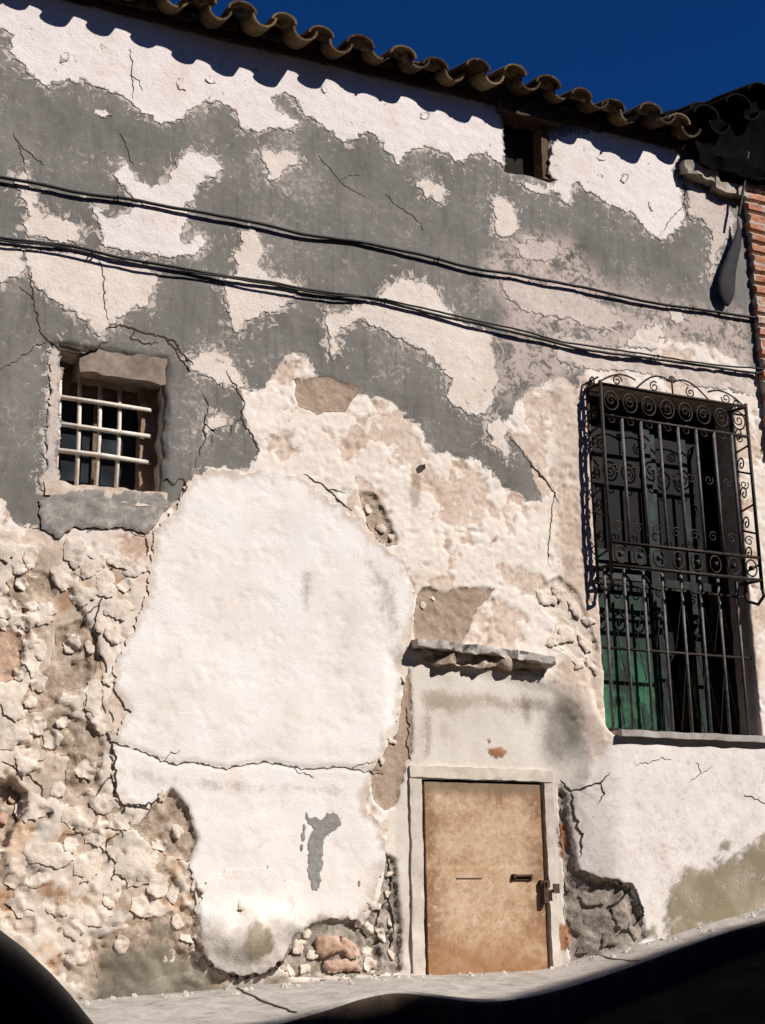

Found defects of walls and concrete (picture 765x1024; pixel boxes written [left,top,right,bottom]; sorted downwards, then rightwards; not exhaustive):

peeling [0,0,506,168]
crack [0,261,194,371]
peeling [0,151,225,337]
crack [165,370,260,497]
peeling [322,278,513,460]
crack [510,438,559,564]
peeling [520,131,734,277]
spalling [0,545,204,986]
crack [32,527,384,881]
rust [489,739,507,758]
spalling [280,853,402,977]
crack [561,772,645,933]